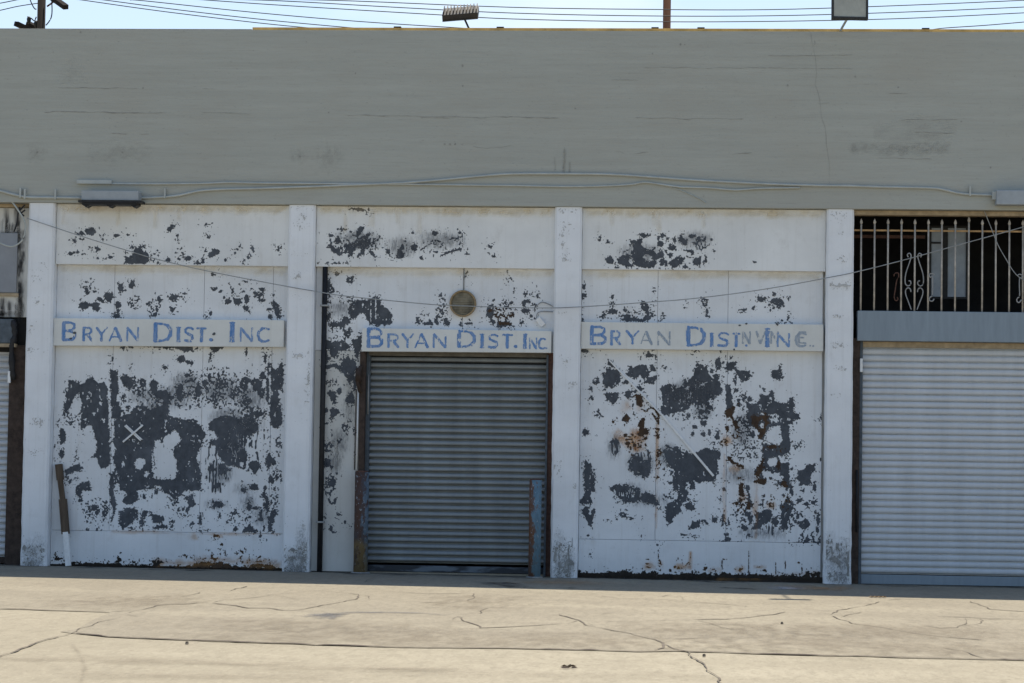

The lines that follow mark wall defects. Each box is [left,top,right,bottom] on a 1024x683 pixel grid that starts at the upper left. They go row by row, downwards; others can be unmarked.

peeling [415,242,547,330]
peeling [598,229,716,270]
peeling [54,207,470,572]
corrosion [608,386,665,482]
peeling [568,349,849,582]
corrosion [719,403,793,522]